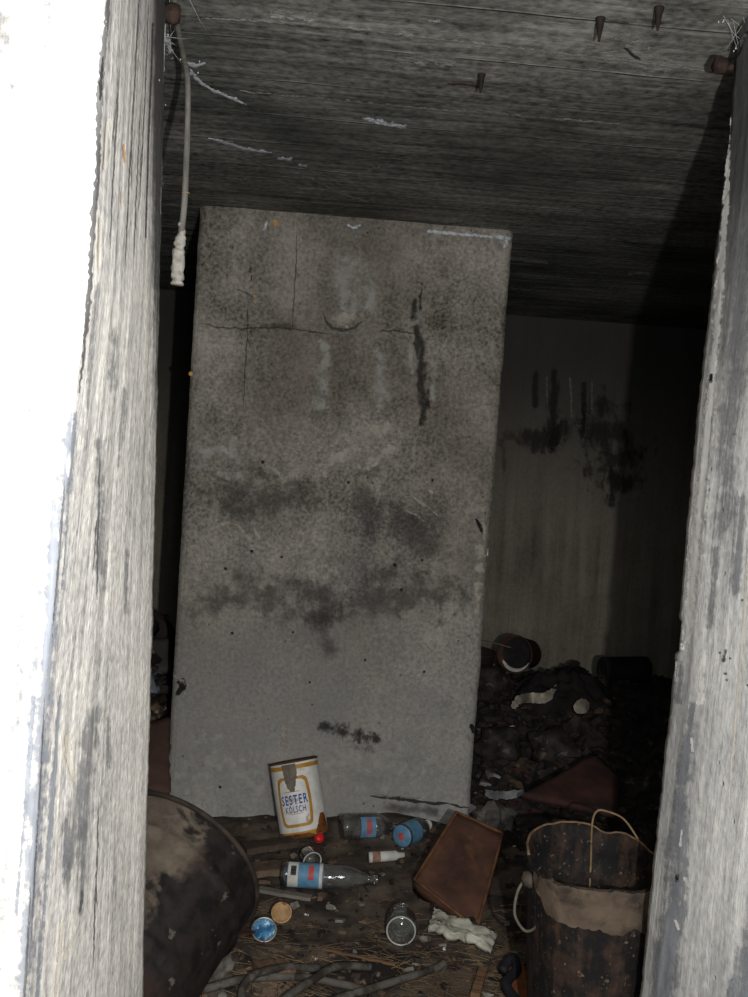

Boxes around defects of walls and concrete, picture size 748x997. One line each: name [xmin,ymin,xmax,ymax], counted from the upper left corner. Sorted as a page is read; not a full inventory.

damp [409,294,436,425]
damp [523,370,593,453]
damp [317,722,457,794]